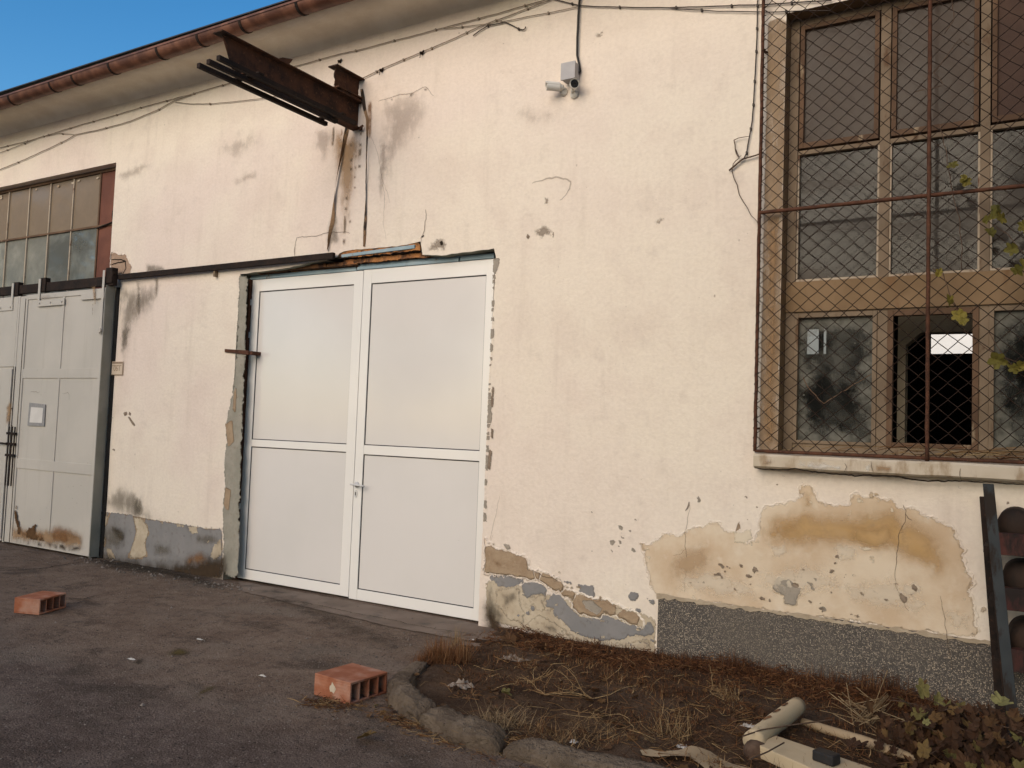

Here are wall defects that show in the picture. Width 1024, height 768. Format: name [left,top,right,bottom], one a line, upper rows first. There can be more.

flaking render [489,258,500,366]
peeling [97,276,248,578]
flaking render [484,383,494,485]
rust [13,506,81,545]
peeling [482,482,986,653]
crack [895,505,911,581]